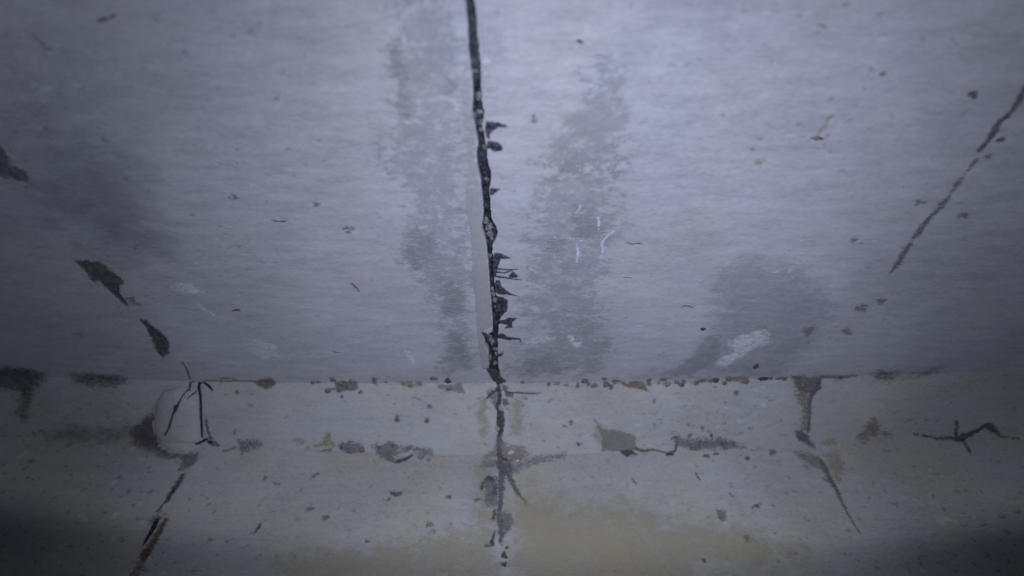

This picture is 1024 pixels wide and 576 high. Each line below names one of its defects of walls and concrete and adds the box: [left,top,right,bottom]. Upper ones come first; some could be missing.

spalling [0,147,28,182]
crack [891,88,1024,272]
spalling [76,260,141,307]
crack [466,0,540,567]
spalling [140,319,169,357]
spalling [594,420,637,457]
crack [914,421,1015,453]
crack [155,474,185,512]
crack [795,452,860,532]
corrosion [131,513,169,576]